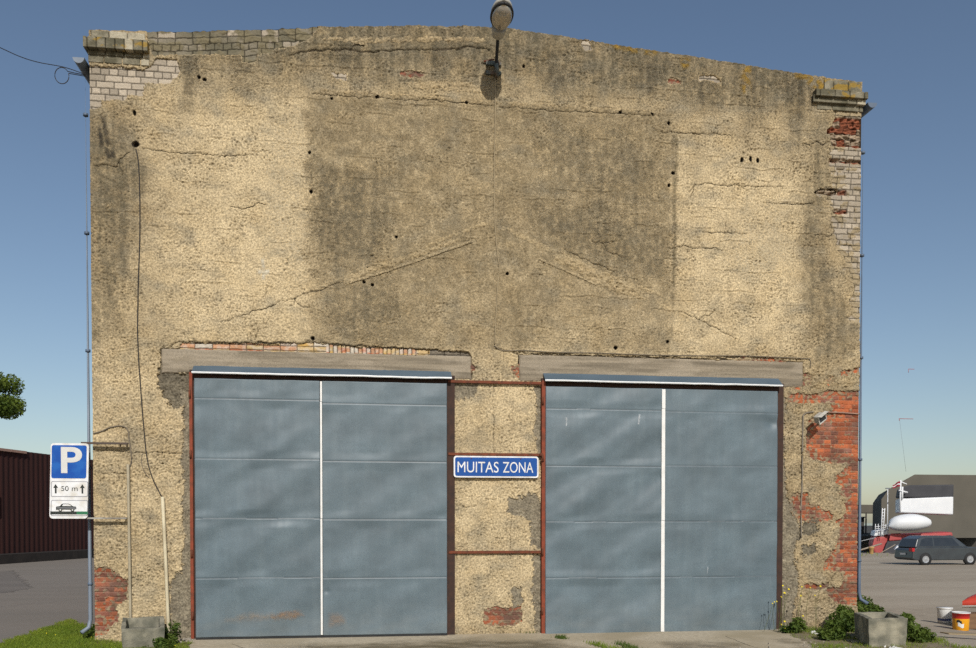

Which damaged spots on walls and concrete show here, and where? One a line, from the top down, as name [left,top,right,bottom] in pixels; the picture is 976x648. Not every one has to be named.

spalling [90,27,318,109]
spalling [816,111,861,323]
crack [178,272,420,350]
spalling [94,565,128,636]
peeling [483,492,541,633]
spalling [782,367,859,628]